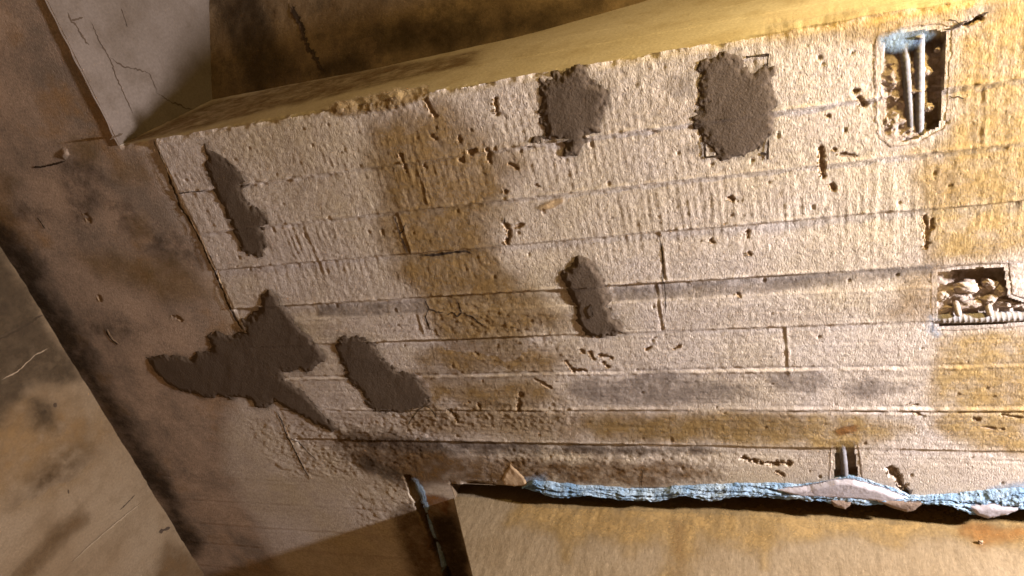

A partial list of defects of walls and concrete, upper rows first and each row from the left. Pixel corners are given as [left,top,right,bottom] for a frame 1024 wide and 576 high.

crack [291,4,326,72]
crack [68,13,192,140]
spalling [852,16,982,147]
leakage [921,0,1024,272]
leakage [372,106,556,428]
leakage [764,275,840,291]
leakage [874,268,905,278]
spalling [930,262,1024,331]
leakage [574,374,742,403]
leakage [935,333,1024,452]
leakage [579,414,890,448]
spalling [829,443,864,480]